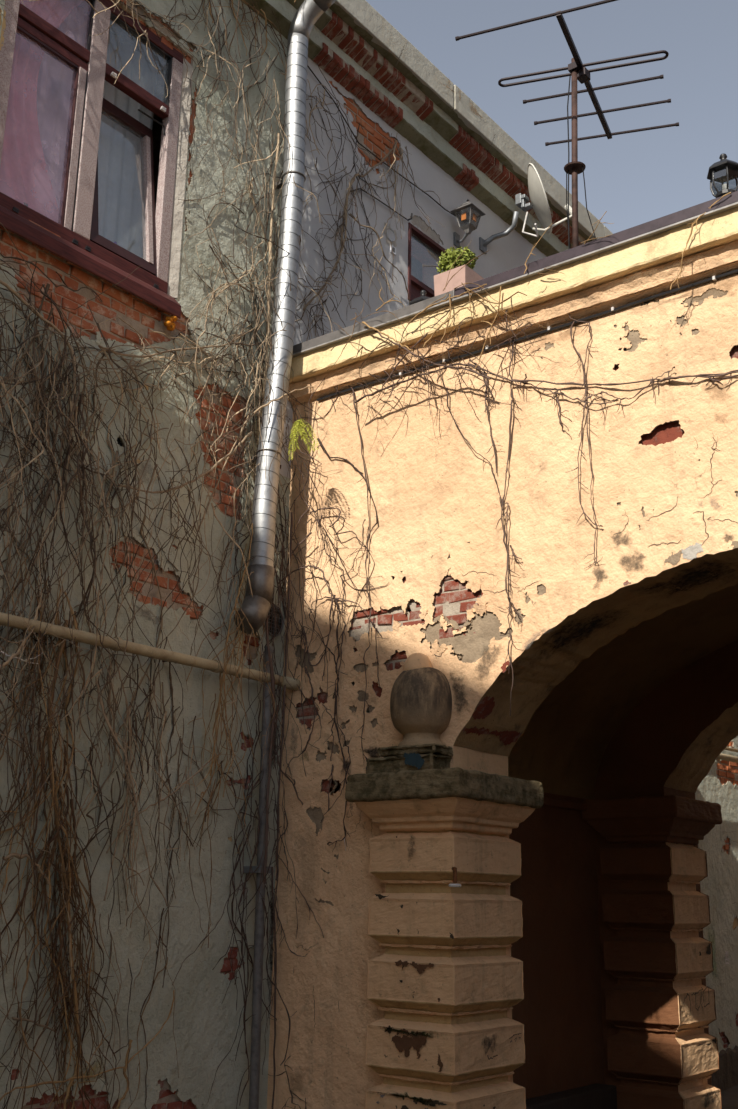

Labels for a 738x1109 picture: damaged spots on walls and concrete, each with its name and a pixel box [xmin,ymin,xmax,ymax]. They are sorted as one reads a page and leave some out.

flaking render [312,11,433,175]
spalling [0,226,194,351]
spalling [193,382,249,526]
spalling [639,420,685,446]
spalling [109,536,219,640]
peeling [316,574,546,763]
spalling [296,683,335,731]
spalling [716,759,738,788]
peeling [306,775,344,837]
peeling [384,1025,443,1072]
spalling [21,1079,120,1109]
spalling [151,1078,198,1109]